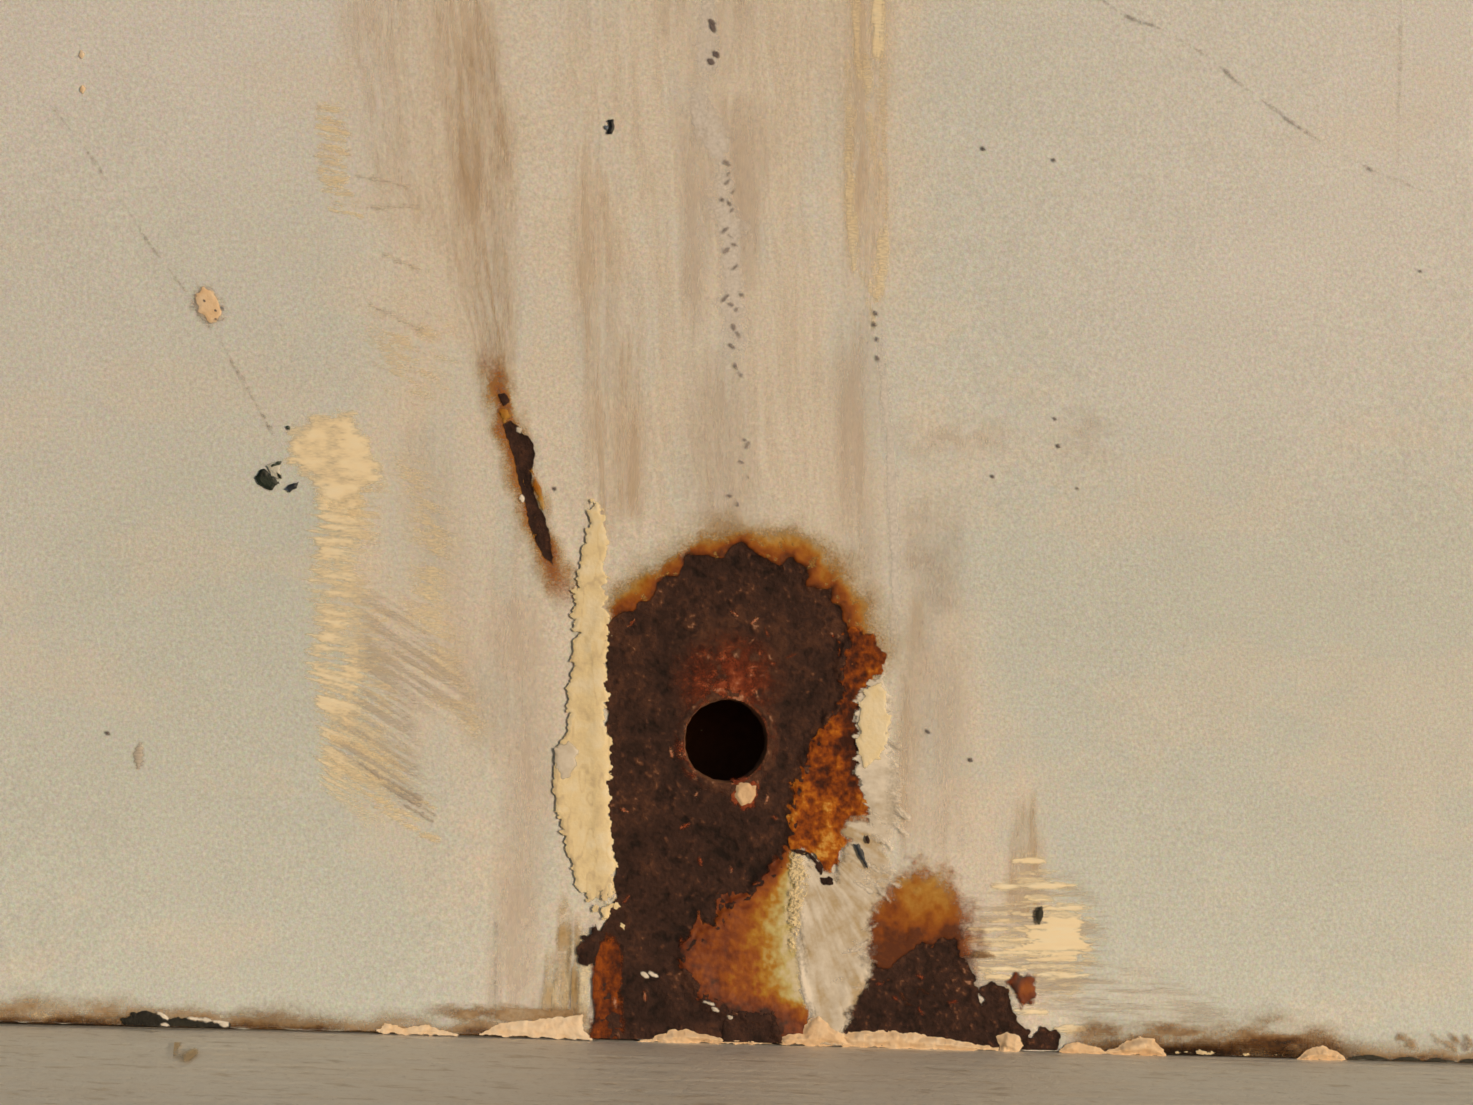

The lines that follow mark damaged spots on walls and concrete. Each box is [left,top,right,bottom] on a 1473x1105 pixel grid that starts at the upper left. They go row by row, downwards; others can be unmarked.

corrosion [485,367,571,591]
water stain [0,998,590,1035]
peeling [255,412,476,841]
peeling [542,908,591,1025]
peeling [552,498,625,929]
corrosion [577,522,887,1044]
peeling [785,674,911,1045]
corrosion [843,861,1061,1051]
water stain [1076,1020,1473,1061]